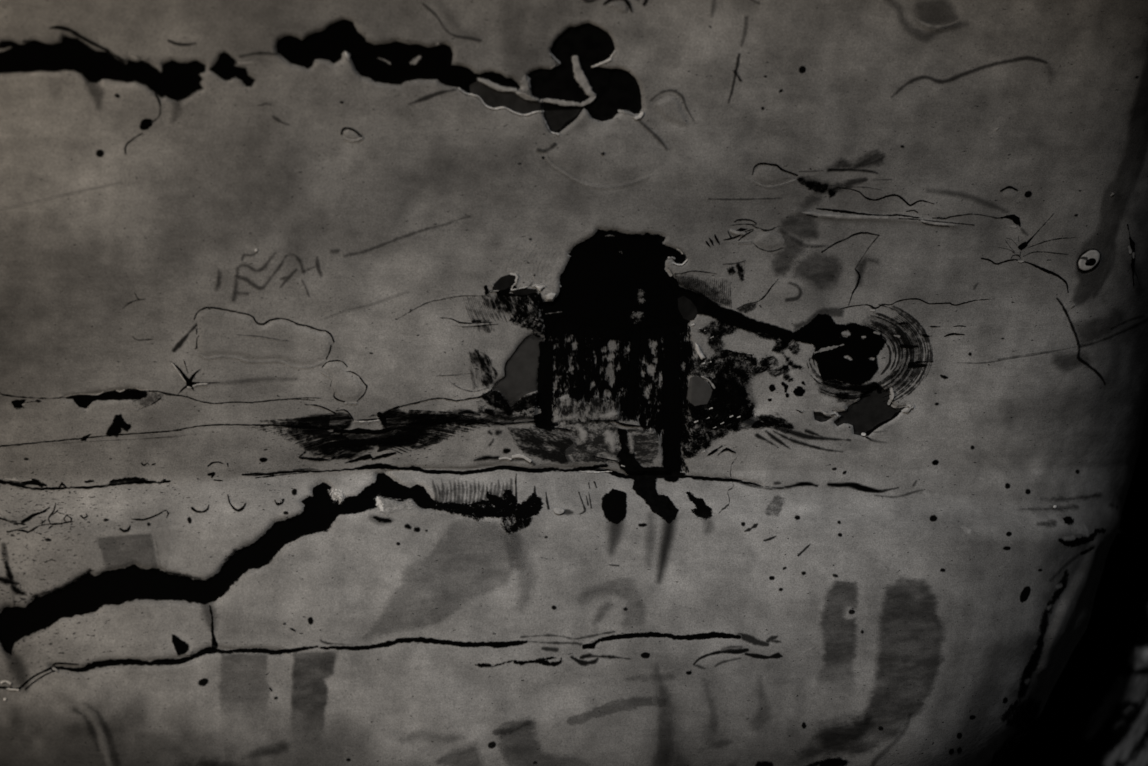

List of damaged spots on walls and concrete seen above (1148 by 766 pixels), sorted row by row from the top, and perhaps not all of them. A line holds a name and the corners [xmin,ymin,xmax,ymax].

spalling [0,26,255,101]
spalling [276,19,644,135]
spalling [484,273,561,301]
crack [803,187,1106,385]
crack [0,373,492,534]
crack [207,456,631,481]
spalling [491,333,542,407]
spalling [687,343,740,428]
crack [662,462,916,513]
spalling [813,386,914,440]
crack [0,605,782,691]
leakage [807,581,939,756]